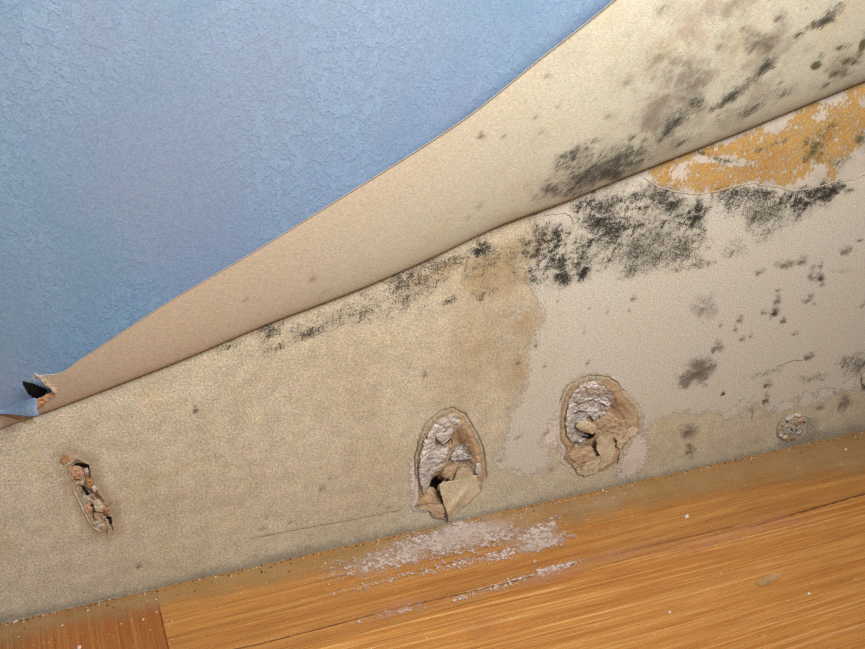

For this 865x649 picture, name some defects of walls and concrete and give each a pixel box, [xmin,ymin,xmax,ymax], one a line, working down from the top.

water stain [796,2,846,37]
water stain [812,39,865,87]
water stain [259,26,854,356]
peeling [23,0,865,521]
water stain [679,342,723,388]
peeling [0,414,26,429]
spalling [60,453,114,536]